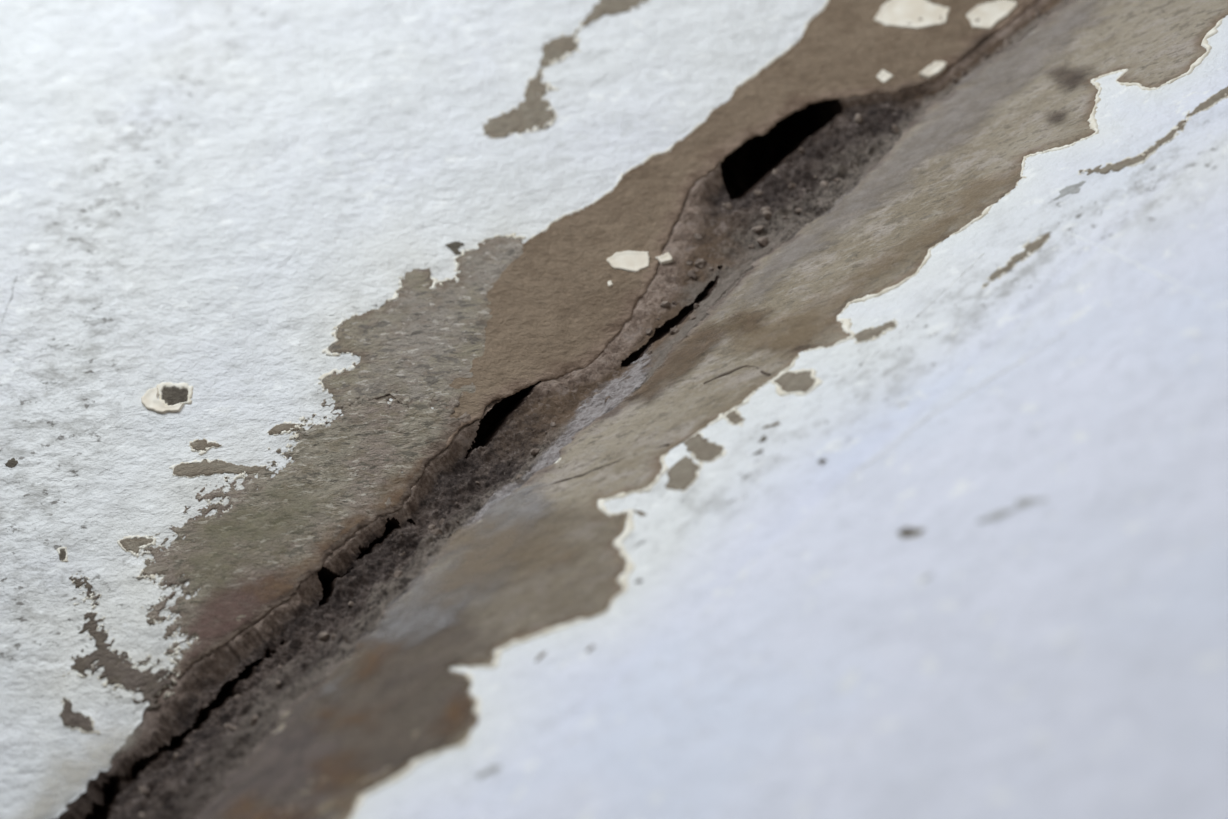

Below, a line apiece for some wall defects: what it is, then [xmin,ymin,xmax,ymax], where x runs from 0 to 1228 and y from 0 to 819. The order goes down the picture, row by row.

peeling [1053,86,1228,201]
peeling [63,0,1069,711]
crack [704,365,771,384]
peeling [57,547,68,562]
crack [55,265,723,819]
damp [189,311,764,819]
peeling [59,697,100,734]